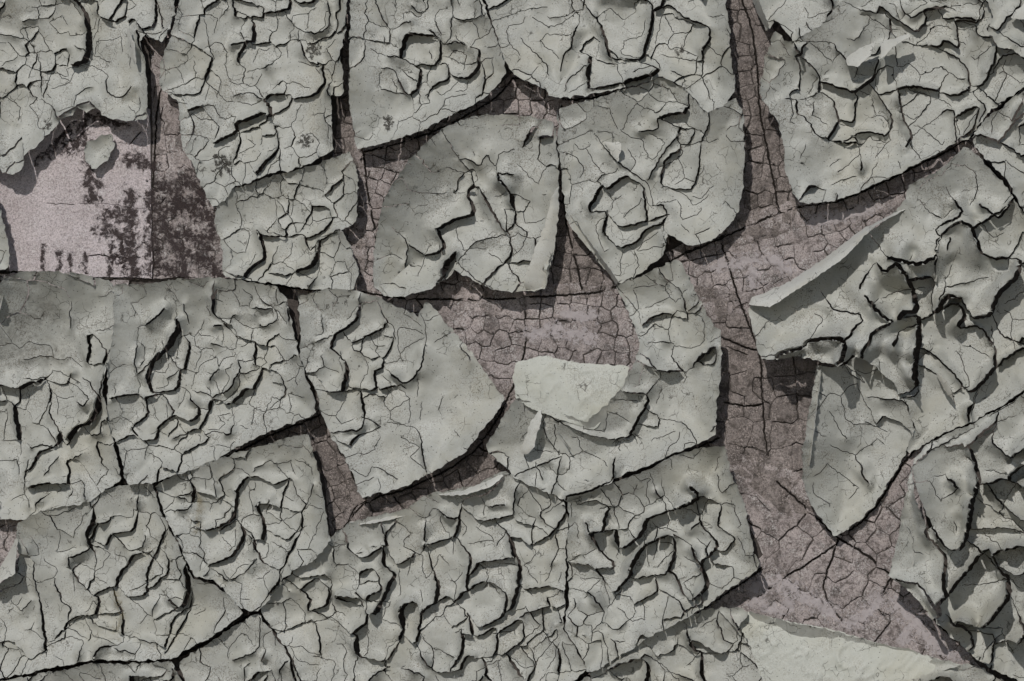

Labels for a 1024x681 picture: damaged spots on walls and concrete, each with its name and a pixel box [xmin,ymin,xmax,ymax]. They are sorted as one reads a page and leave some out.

crack [74,0,1024,547]
peeling [672,243,685,258]
peeling [701,302,717,320]
peeling [728,300,744,315]
peeling [731,263,752,326]
peeling [565,338,1002,681]
crack [694,392,1024,621]
peeling [889,393,1024,681]
crack [0,575,296,681]
crack [933,619,1018,681]